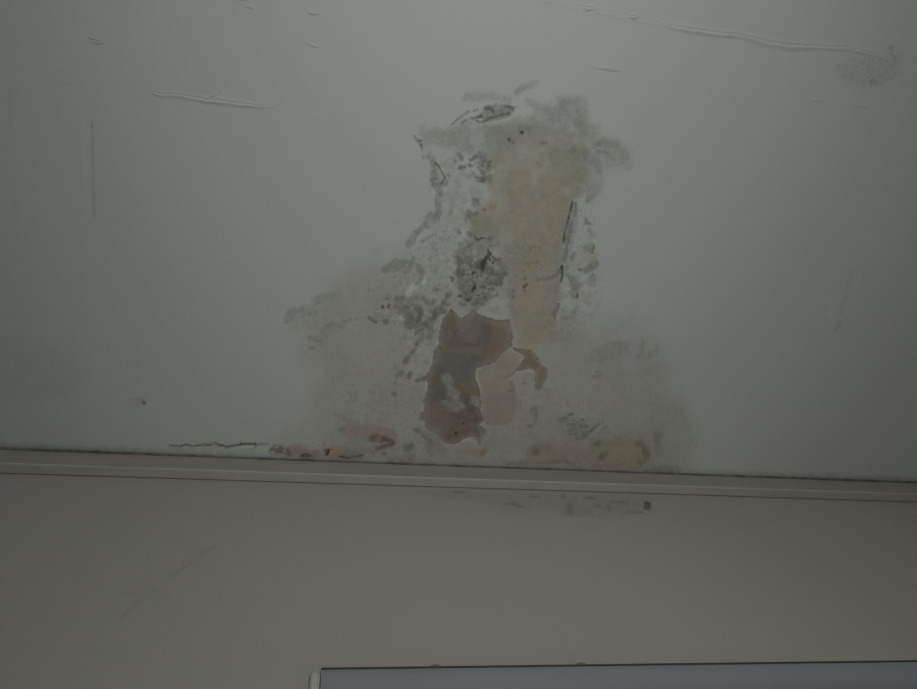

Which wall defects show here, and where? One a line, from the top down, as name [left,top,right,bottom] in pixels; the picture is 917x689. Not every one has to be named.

water stain [452,105,595,348]
crack [173,440,263,448]
flaking render [419,309,548,444]